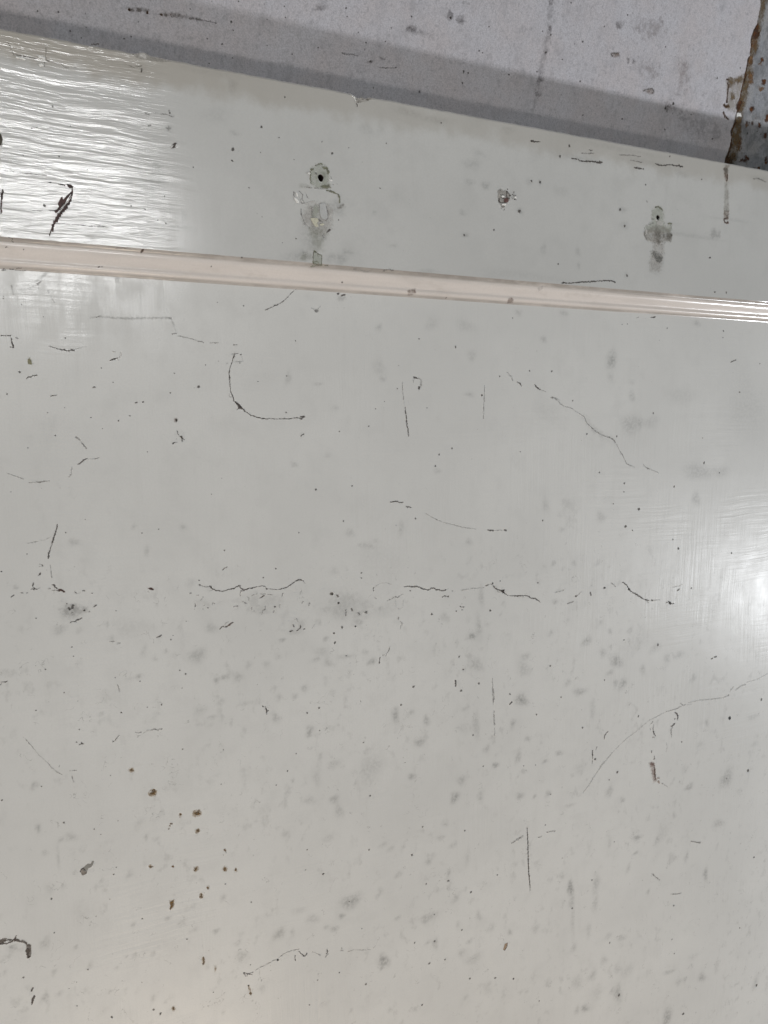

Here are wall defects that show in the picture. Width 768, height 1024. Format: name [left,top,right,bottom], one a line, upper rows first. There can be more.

corrosion [724,0,768,181]
peeling [294,163,340,232]
spalling [498,189,517,207]
peeling [644,206,672,259]
crack [199,579,303,592]
crack [486,583,541,603]
crack [567,582,679,605]